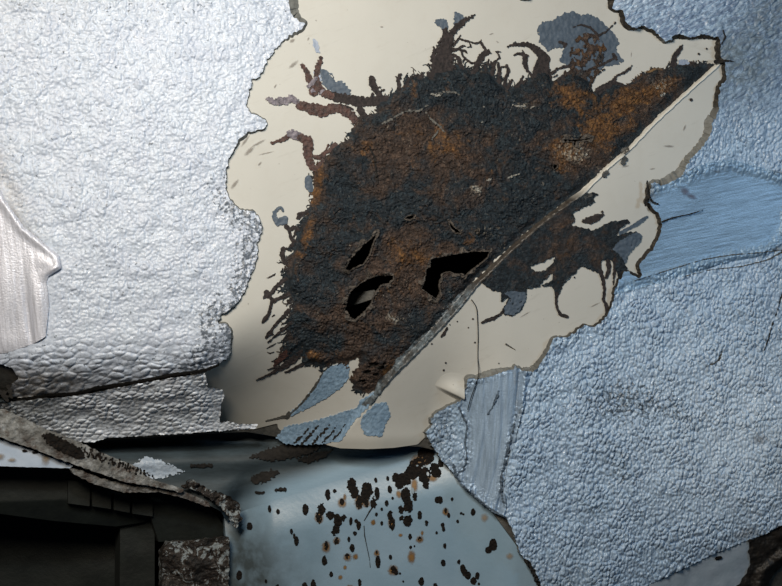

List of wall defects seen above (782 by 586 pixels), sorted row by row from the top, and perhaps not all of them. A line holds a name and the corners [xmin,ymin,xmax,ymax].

peeling [190,0,722,449]
corrosion [256,12,715,397]
crack [644,180,702,223]
crack [634,250,782,281]
crack [764,294,782,351]
crack [9,364,219,401]
spalling [0,437,147,496]
corrosion [302,448,443,586]
corrosion [435,496,475,534]
spalling [155,541,165,586]
corrosion [457,559,480,585]
corrosion [485,539,497,553]